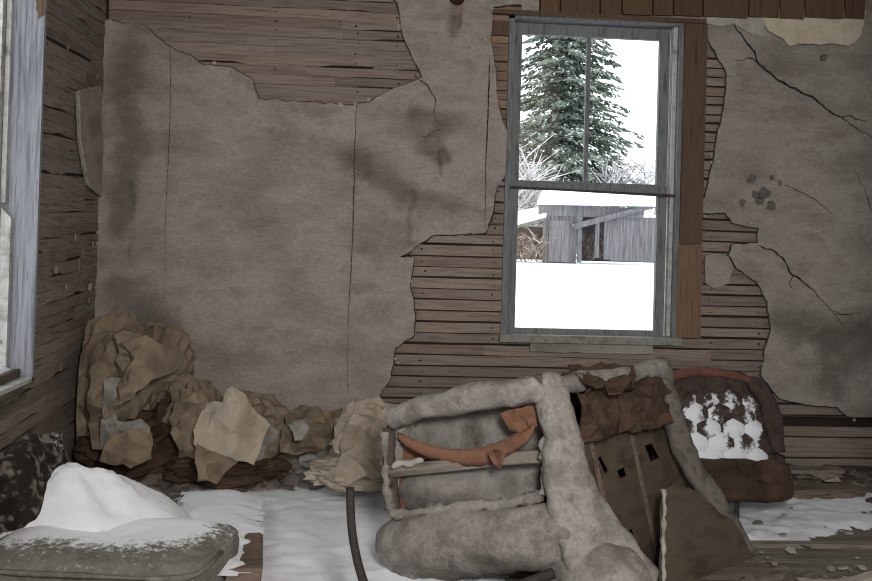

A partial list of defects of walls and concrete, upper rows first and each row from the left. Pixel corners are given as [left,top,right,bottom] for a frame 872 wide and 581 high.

spalling [703,36,727,202]
crack [733,24,872,138]
spalling [0,0,423,463]
spalling [379,174,872,467]
crack [759,245,859,321]